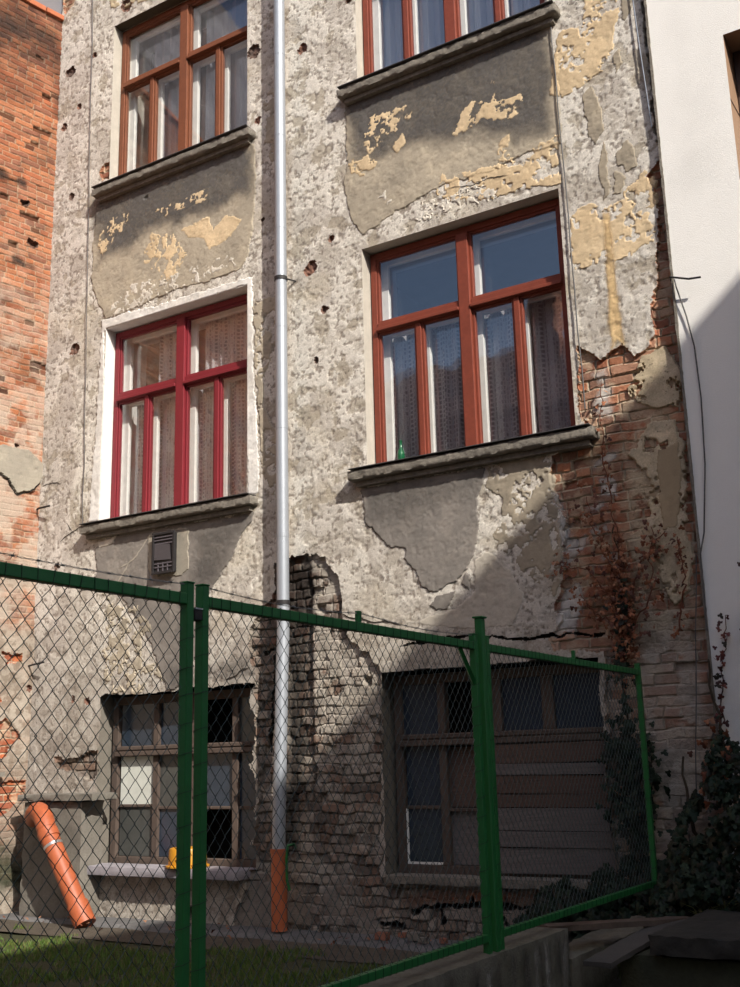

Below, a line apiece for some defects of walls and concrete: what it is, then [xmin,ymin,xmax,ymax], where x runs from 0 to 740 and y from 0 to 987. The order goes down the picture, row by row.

peeling [156,190,207,216]
peeling [348,105,412,177]
peeling [452,81,523,137]
peeling [415,133,562,222]
flaking render [582,86,638,201]
flaking render [621,0,658,144]
peeling [110,215,241,318]
flaking render [548,159,723,879]
crack [341,613,605,647]
flaking render [0,779,26,816]
flaking render [233,562,277,928]
flaking render [286,553,483,941]